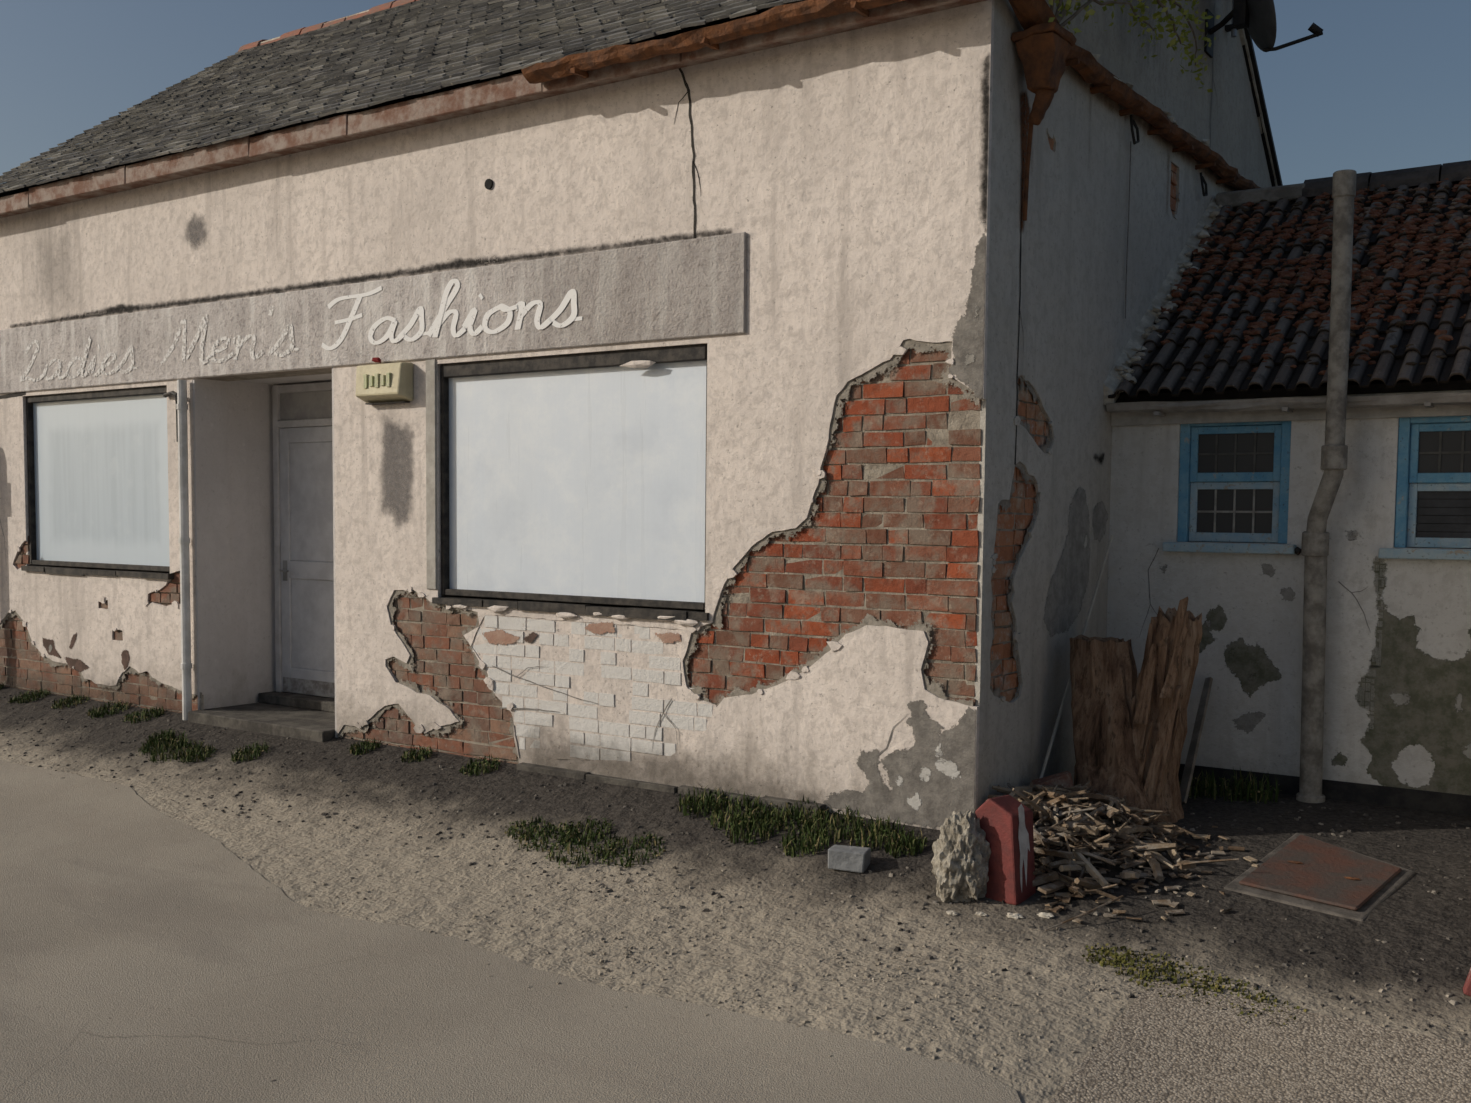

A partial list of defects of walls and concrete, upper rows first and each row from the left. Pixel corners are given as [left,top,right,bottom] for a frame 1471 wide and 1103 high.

crack [674,68,701,239]
leakage [187,218,205,245]
leakage [12,230,731,328]
flaking render [1013,375,1055,454]
leakage [382,422,412,523]
flaking render [14,536,32,569]
flaking render [144,571,181,609]
flaking render [338,229,1043,829]
flaking render [0,610,204,713]
peeling [1199,605,1282,734]
peeling [1355,556,1471,795]
peeling [1331,752,1348,766]